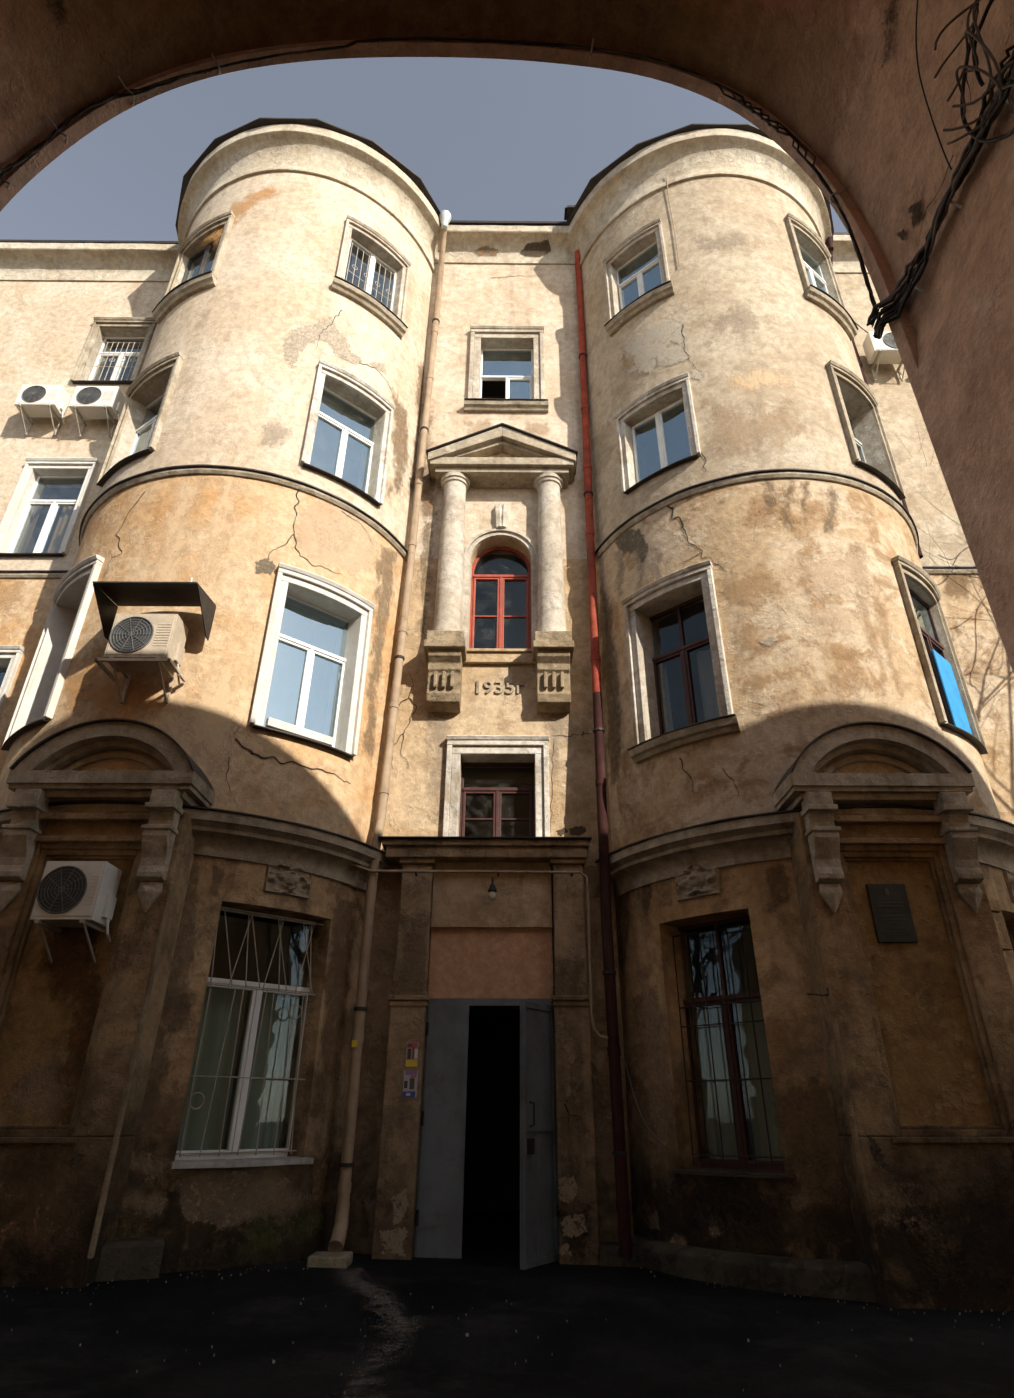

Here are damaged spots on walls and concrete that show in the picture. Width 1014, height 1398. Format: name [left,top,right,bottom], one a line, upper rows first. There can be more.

peeling [520,238,551,256]
flaking render [282,316,386,374]
flaking render [623,317,703,380]
crack [103,492,145,578]
crack [268,490,339,574]
crack [667,505,727,572]
crack [226,738,351,794]
water stain [321,900,352,1076]
flaking render [379,1189,410,1258]
flaking render [557,1175,590,1259]